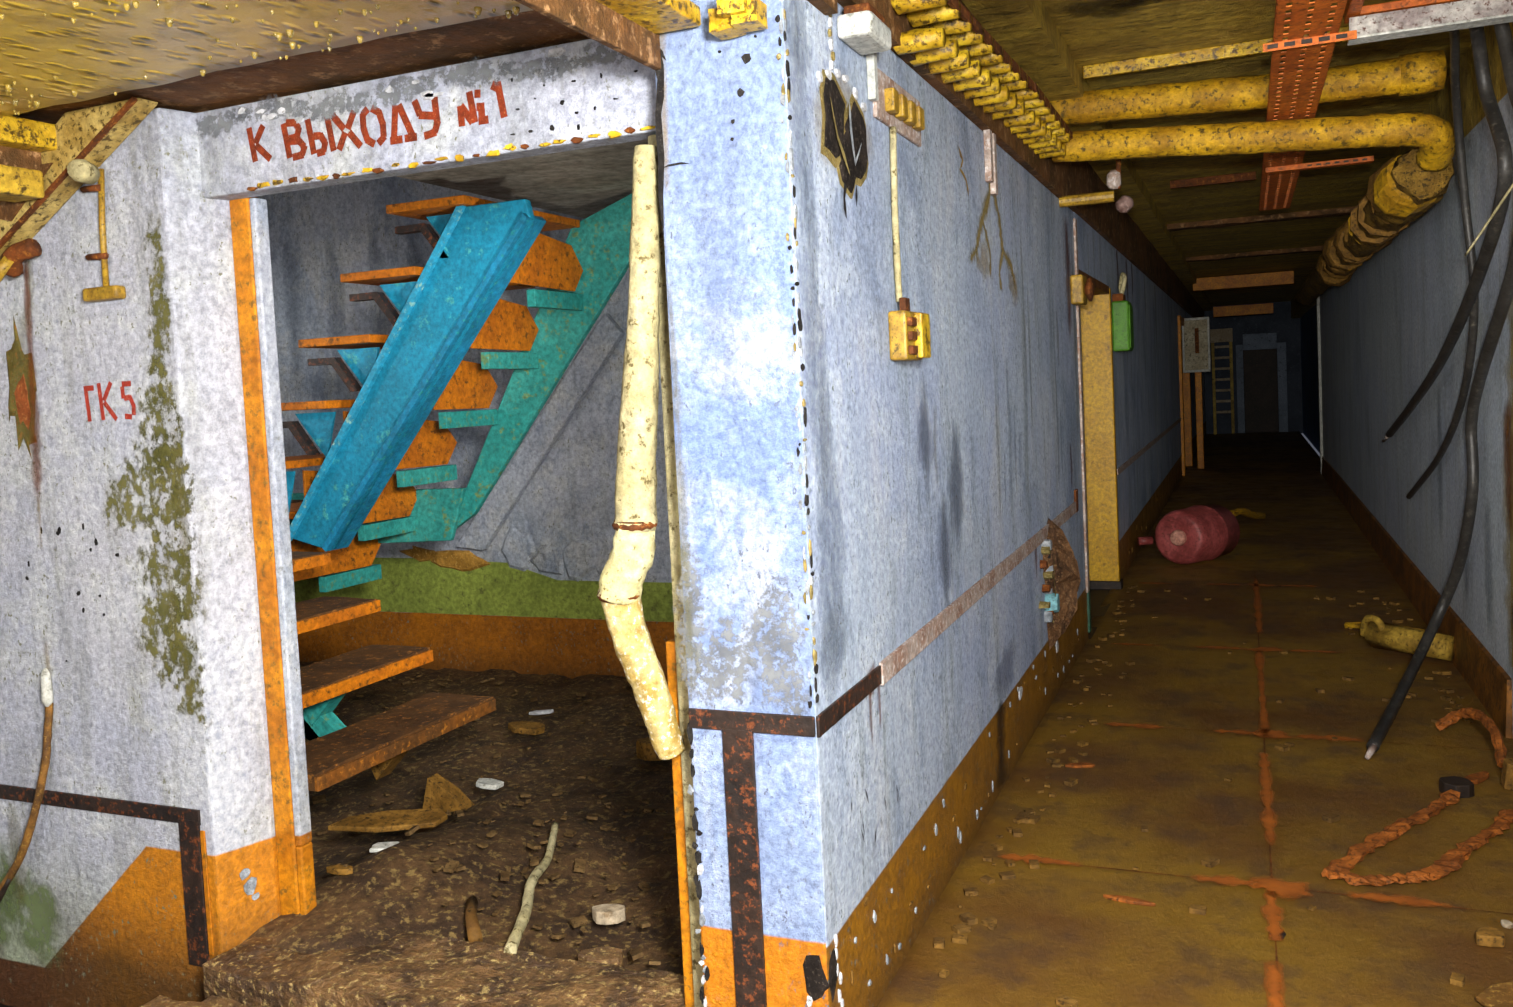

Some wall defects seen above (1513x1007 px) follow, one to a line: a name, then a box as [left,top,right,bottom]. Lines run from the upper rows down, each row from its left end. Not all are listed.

water stain [103,216,207,728]
water stain [0,854,57,959]